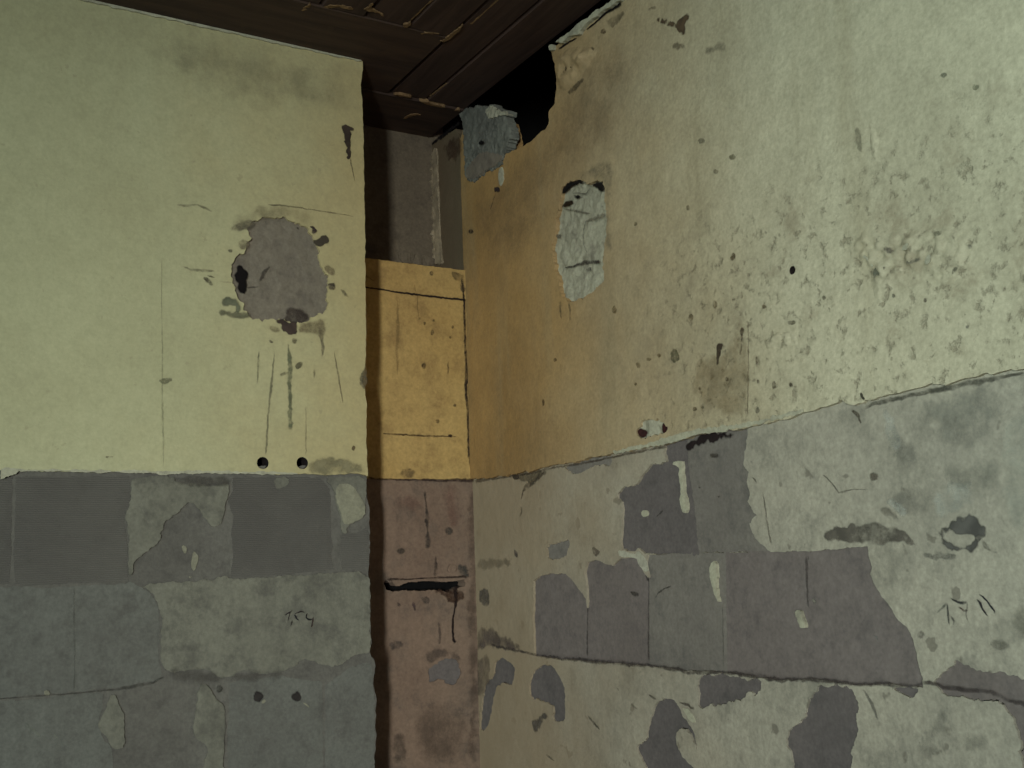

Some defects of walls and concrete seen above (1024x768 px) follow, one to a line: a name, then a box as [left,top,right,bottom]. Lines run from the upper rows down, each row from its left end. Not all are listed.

spalling [297,226,329,246]
spalling [555,180,607,312]
peeling [220,297,249,318]
spalling [277,319,325,336]
leakage [287,340,302,428]
crack [869,373,1022,407]
peeling [336,484,365,524]
crack [451,587,459,643]
spalling [530,419,923,768]
crack [493,645,1024,706]